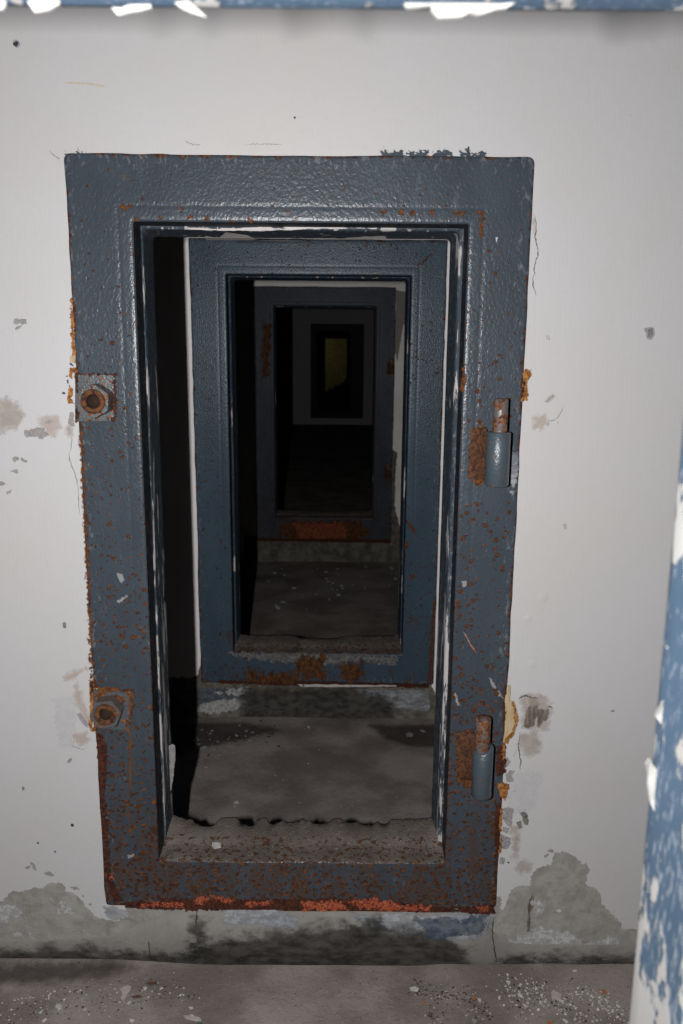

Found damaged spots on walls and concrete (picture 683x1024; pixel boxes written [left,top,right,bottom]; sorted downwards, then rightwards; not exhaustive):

peeling [27,0,61,14]
peeling [112,4,152,16]
peeling [174,1,207,18]
peeling [404,2,517,20]
rust [507,369,531,418]
peeling [24,427,49,439]
rust [67,297,511,915]
peeling [502,685,518,744]
peeling [655,700,664,723]
peeling [645,757,657,810]
peeling [500,807,529,864]
peeling [495,849,637,945]